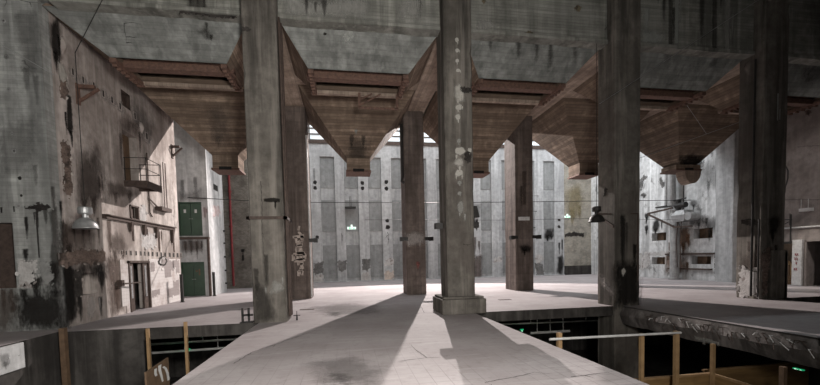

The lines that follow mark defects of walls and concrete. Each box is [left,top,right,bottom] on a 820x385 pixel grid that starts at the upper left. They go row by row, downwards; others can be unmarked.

water stain [50,19,67,86]
water stain [24,187,125,261]
water stain [0,263,58,328]
peeling [735,265,759,299]